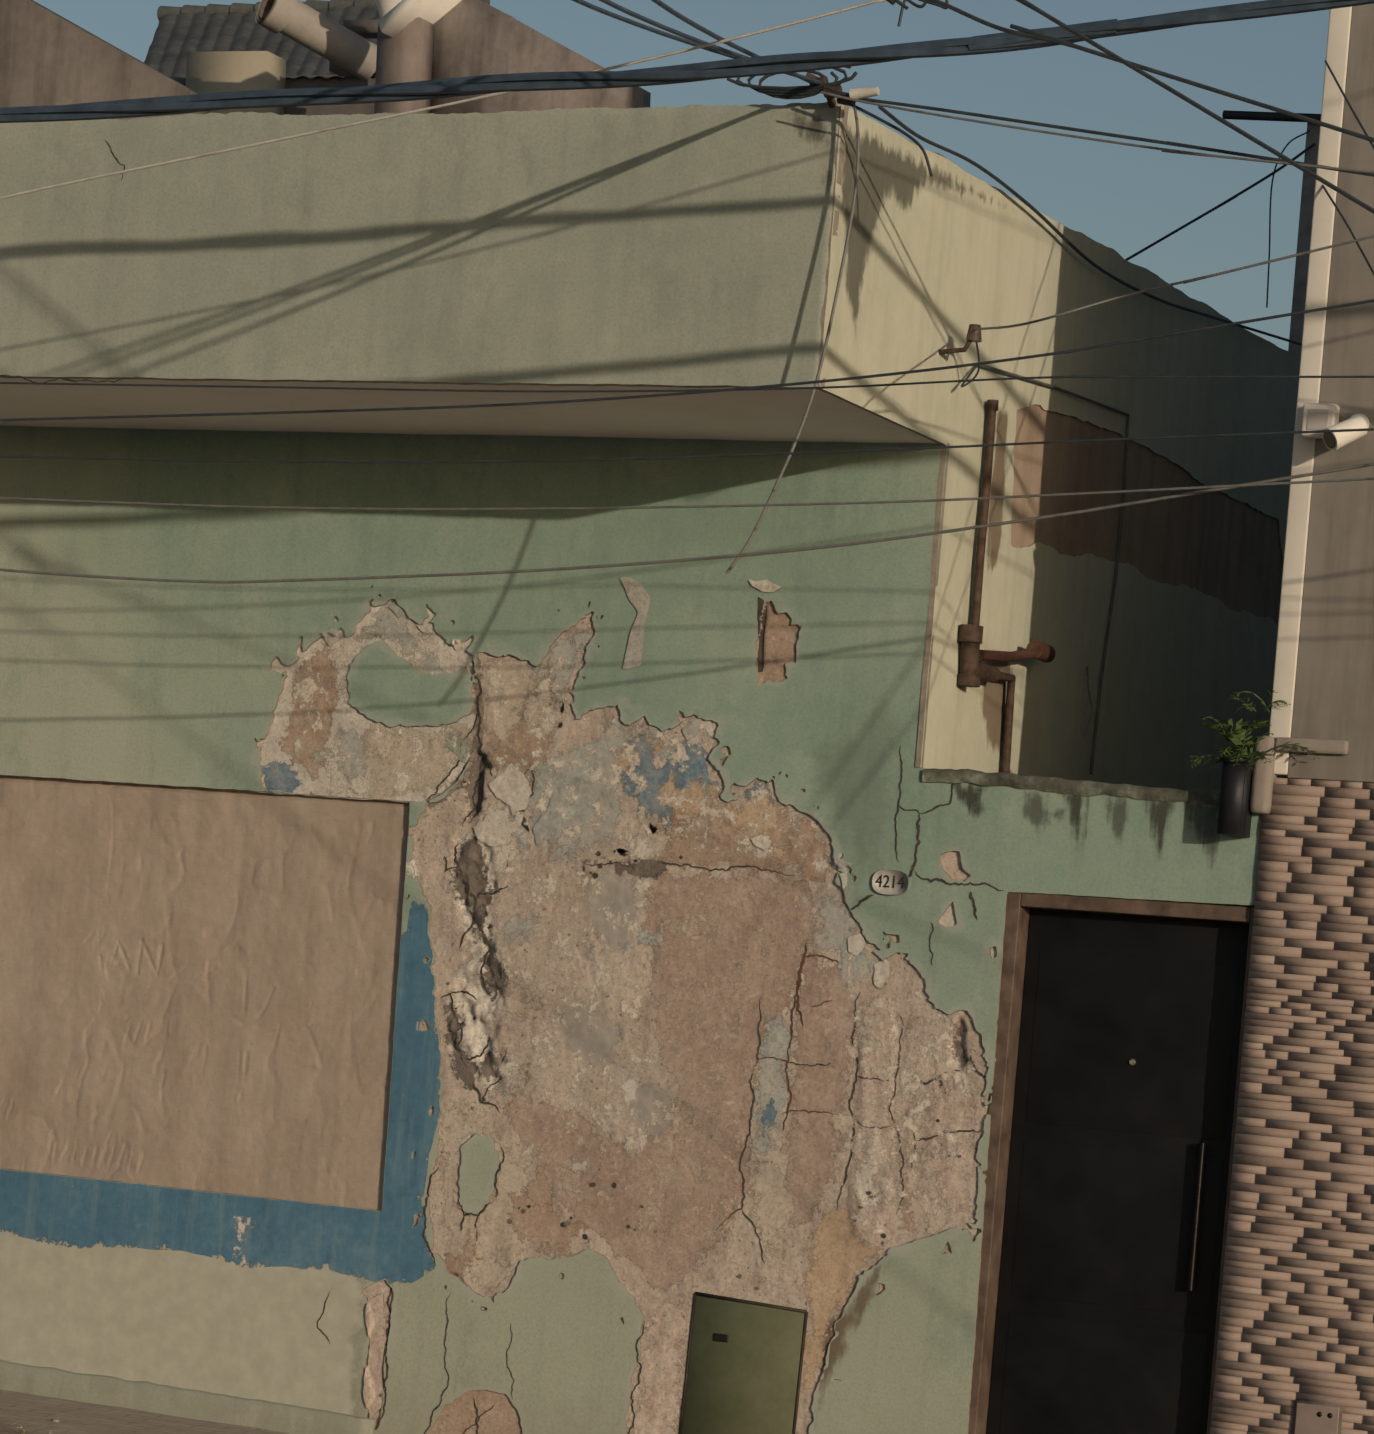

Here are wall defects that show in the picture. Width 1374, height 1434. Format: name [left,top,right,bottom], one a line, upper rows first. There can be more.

damp [843,130,963,316]
flaking render [1011,404,1282,623]
crack [425,655,535,1113]
crack [894,746,1004,919]
damp [954,783,982,814]
damp [1067,795,1081,832]
damp [1151,801,1218,853]
flaking render [246,577,996,1434]
crack [717,942,987,1263]
peeling [233,1216,253,1267]
crack [422,1147,505,1262]
crack [424,1292,514,1434]